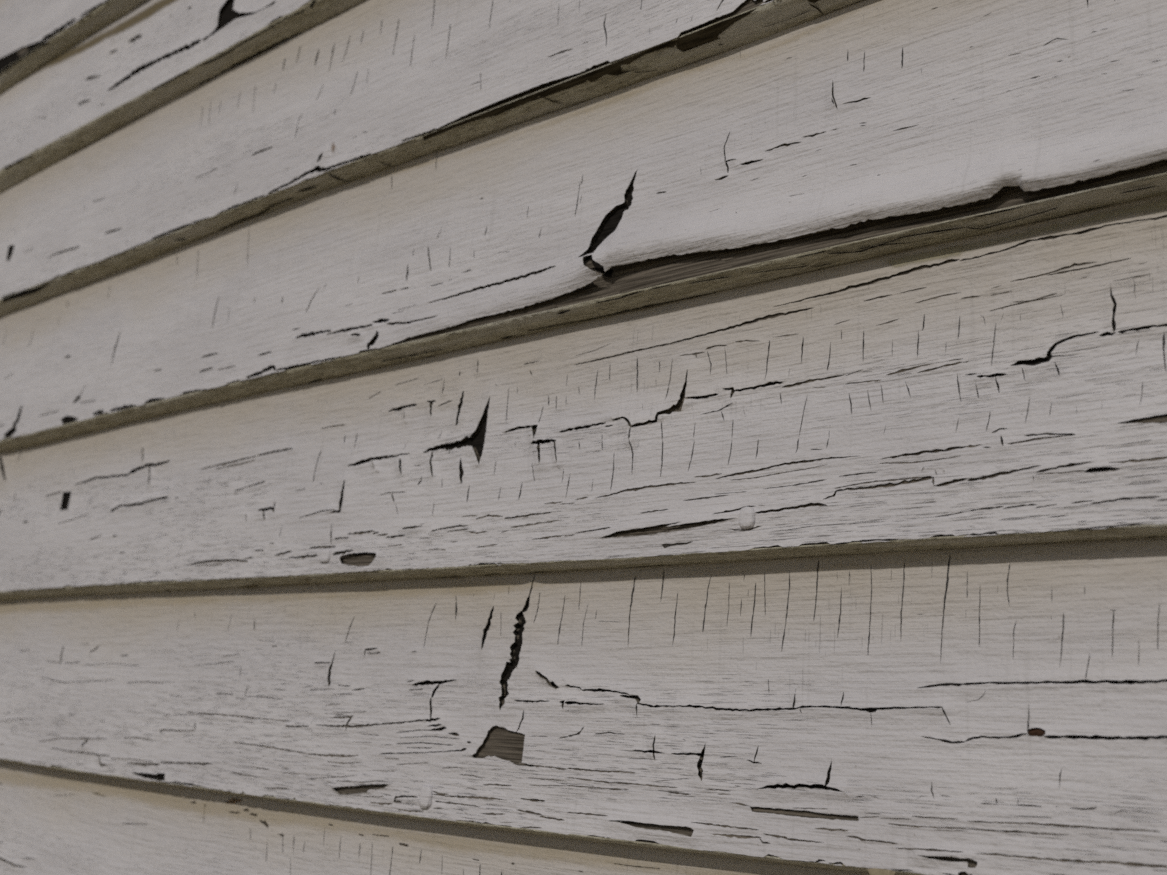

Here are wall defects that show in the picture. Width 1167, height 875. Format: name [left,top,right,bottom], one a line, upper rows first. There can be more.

spalling [218,0,252,31]
spalling [0,41,49,74]
peeling [709,164,1167,268]
crack [502,183,1156,339]
peeling [554,283,622,308]
peeling [392,307,533,346]
crack [956,288,1167,448]
crack [313,332,864,501]
crack [1086,466,1119,474]
peeling [343,552,376,566]
crack [413,532,1167,743]
crack [634,749,840,791]